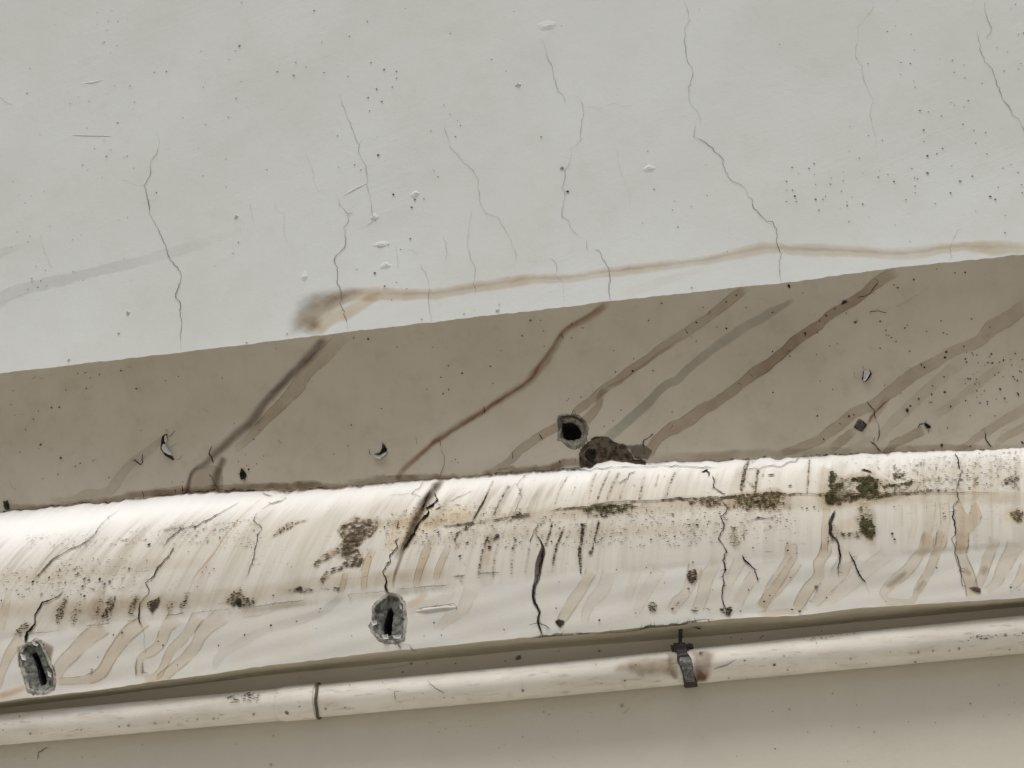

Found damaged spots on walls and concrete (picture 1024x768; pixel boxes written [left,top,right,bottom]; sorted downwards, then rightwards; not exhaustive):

crack [144,155,182,329]
crack [334,204,350,322]
hole [562,422,582,440]
hole [32,652,47,686]
crack [24,595,59,642]
crack [36,501,114,577]
mould [1,519,299,624]
hole [384,608,394,636]
crack [382,440,445,592]
crack [512,425,758,638]
water stain [289,436,1023,593]
crack [917,454,992,587]